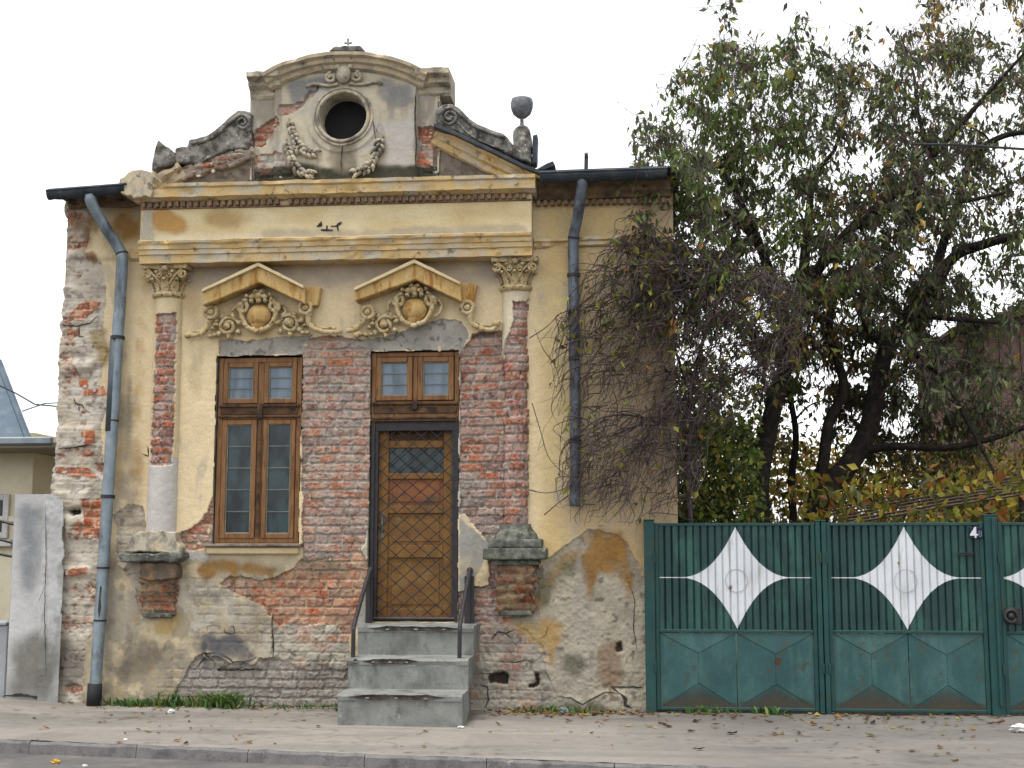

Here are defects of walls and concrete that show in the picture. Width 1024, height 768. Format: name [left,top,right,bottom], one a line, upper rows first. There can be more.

flaking render [182,86,319,178]
flaking render [50,200,180,703]
flaking render [175,297,530,707]
leakage [202,634,252,662]
crack [197,611,274,671]
peeling [369,529,676,711]
crack [629,583,638,651]
crack [559,686,643,708]